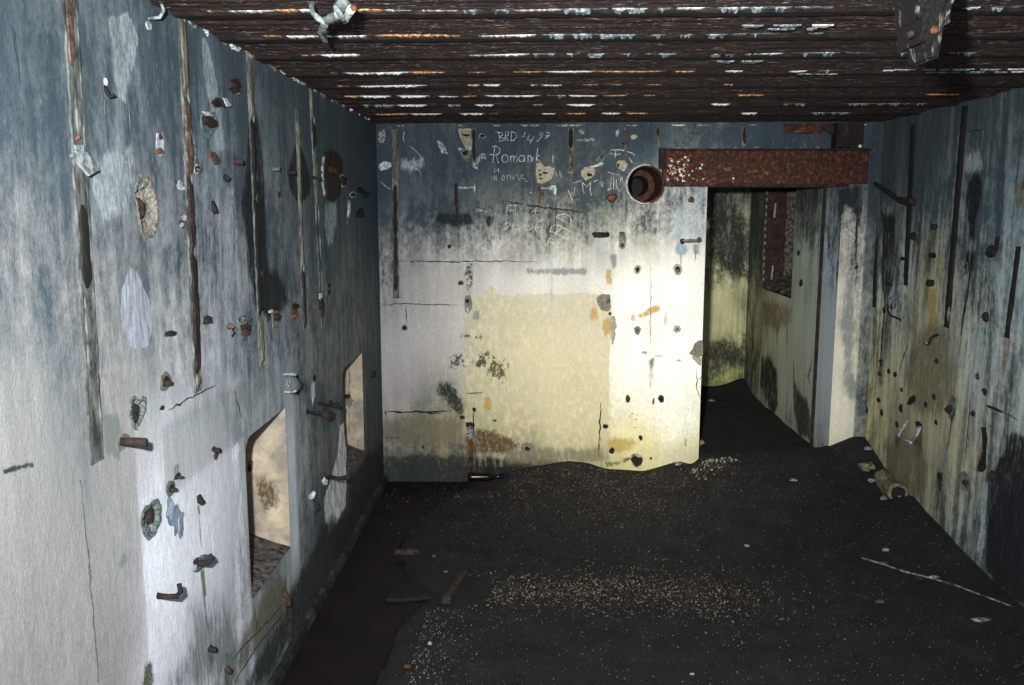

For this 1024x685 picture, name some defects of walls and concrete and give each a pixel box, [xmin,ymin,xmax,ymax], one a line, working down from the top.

spalling [133,172,159,240]
leakage [675,191,747,277]
spalling [689,340,703,366]
mould [709,340,743,364]
spalling [129,395,147,431]
crack [168,385,241,417]
leakage [176,249,634,685]
spalling [141,497,184,541]